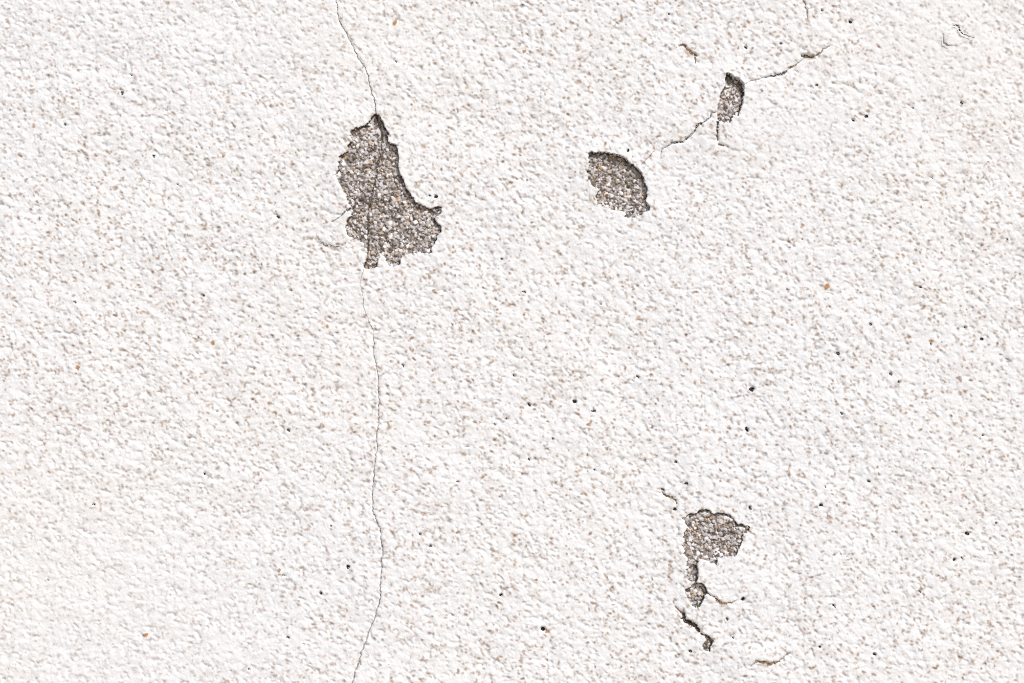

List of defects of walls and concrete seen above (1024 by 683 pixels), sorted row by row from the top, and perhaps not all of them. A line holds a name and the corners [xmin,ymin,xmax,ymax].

crack [336,2,377,114]
crack [678,44,698,63]
crack [747,45,830,83]
spalling [717,73,744,123]
crack [643,112,725,163]
spalling [335,114,441,270]
spalling [587,151,650,218]
crack [352,270,384,683]
spalling [682,509,750,608]
crack [675,606,706,635]